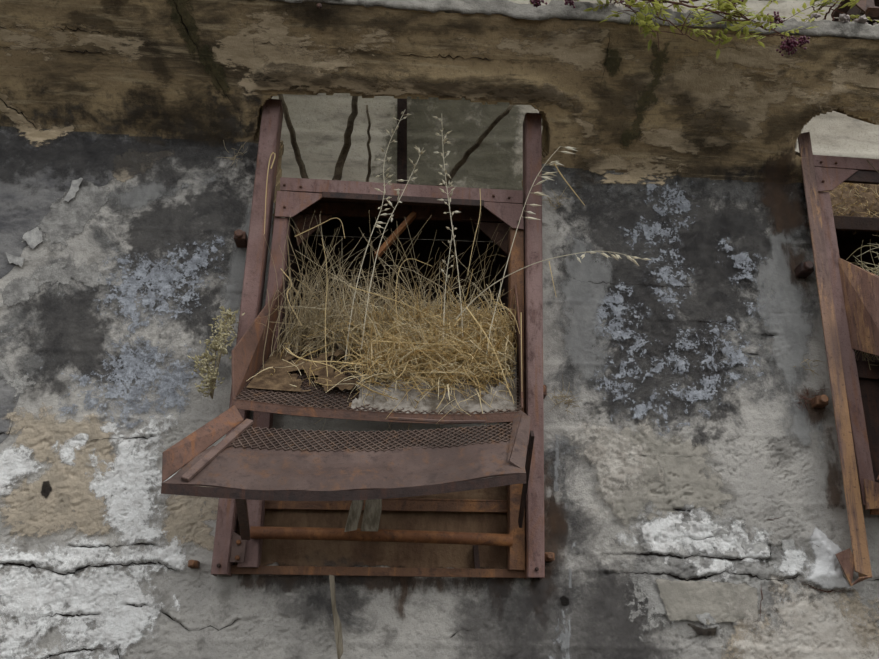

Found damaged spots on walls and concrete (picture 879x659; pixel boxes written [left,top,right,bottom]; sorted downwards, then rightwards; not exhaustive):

crack [0,26,131,55]
peeling [0,24,148,63]
leakage [603,48,622,83]
peeling [0,93,156,307]
leakage [556,165,825,505]
spalling [0,353,117,538]
spalling [161,486,219,551]
crack [0,543,176,575]
crack [602,536,851,621]
crack [42,611,98,619]
crack [127,604,238,631]
crack [45,647,120,659]